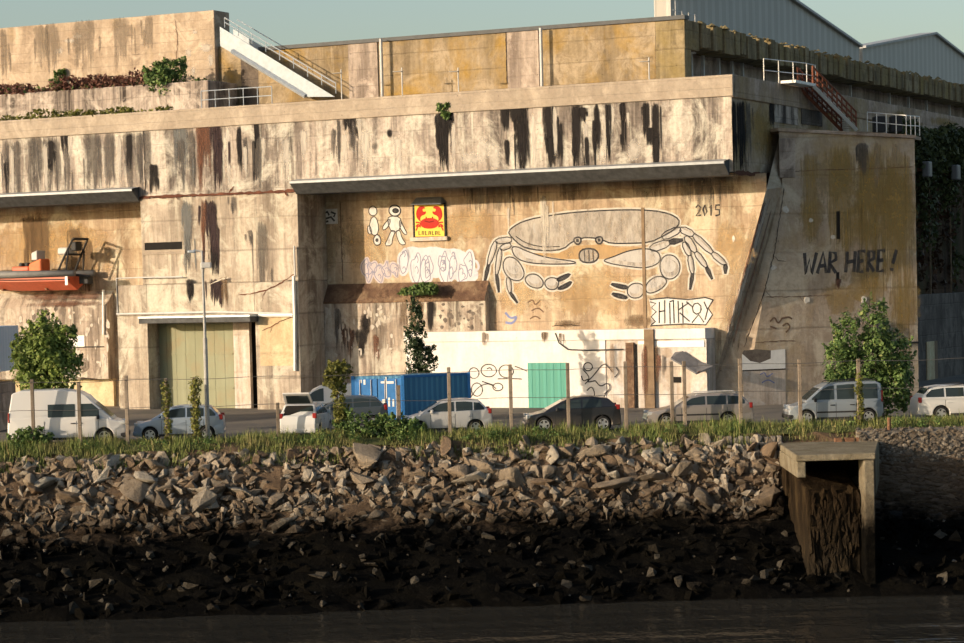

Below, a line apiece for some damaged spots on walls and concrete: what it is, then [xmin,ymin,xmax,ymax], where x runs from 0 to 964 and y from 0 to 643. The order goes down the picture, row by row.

damp [34,22,100,64]
damp [115,17,152,60]
damp [0,132,159,194]
damp [172,129,196,188]
corrosion [196,127,211,255]
damp [209,124,265,189]
damp [434,102,662,172]
damp [682,100,754,212]
damp [181,197,236,307]
damp [245,223,273,282]
damp [829,144,912,347]
damp [354,314,370,358]